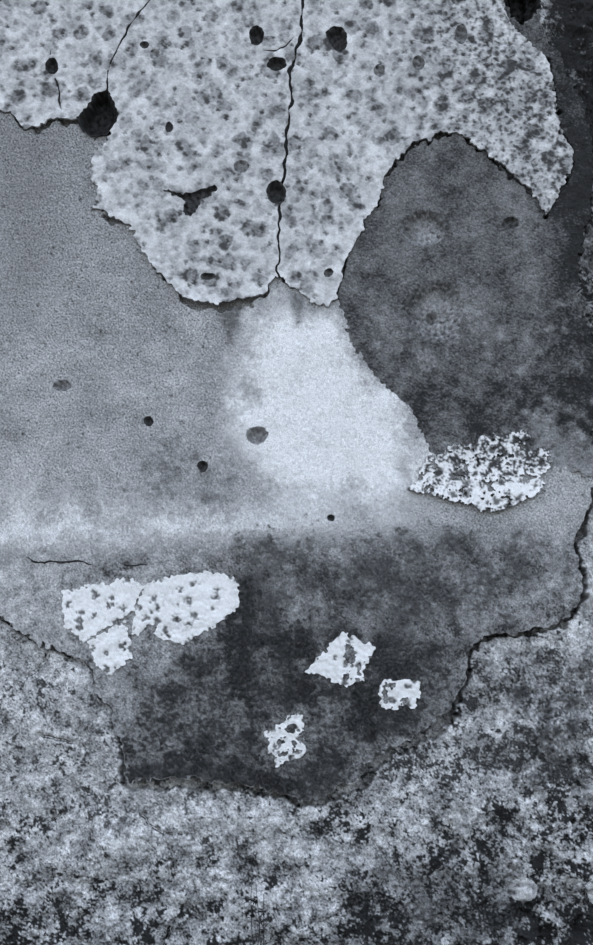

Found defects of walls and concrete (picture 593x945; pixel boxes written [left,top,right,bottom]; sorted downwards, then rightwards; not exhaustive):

crack [106,0,150,89]
crack [266,0,304,280]
peeling [0,0,593,513]
water stain [0,289,537,801]
spalling [0,488,593,945]
water stain [472,645,593,802]